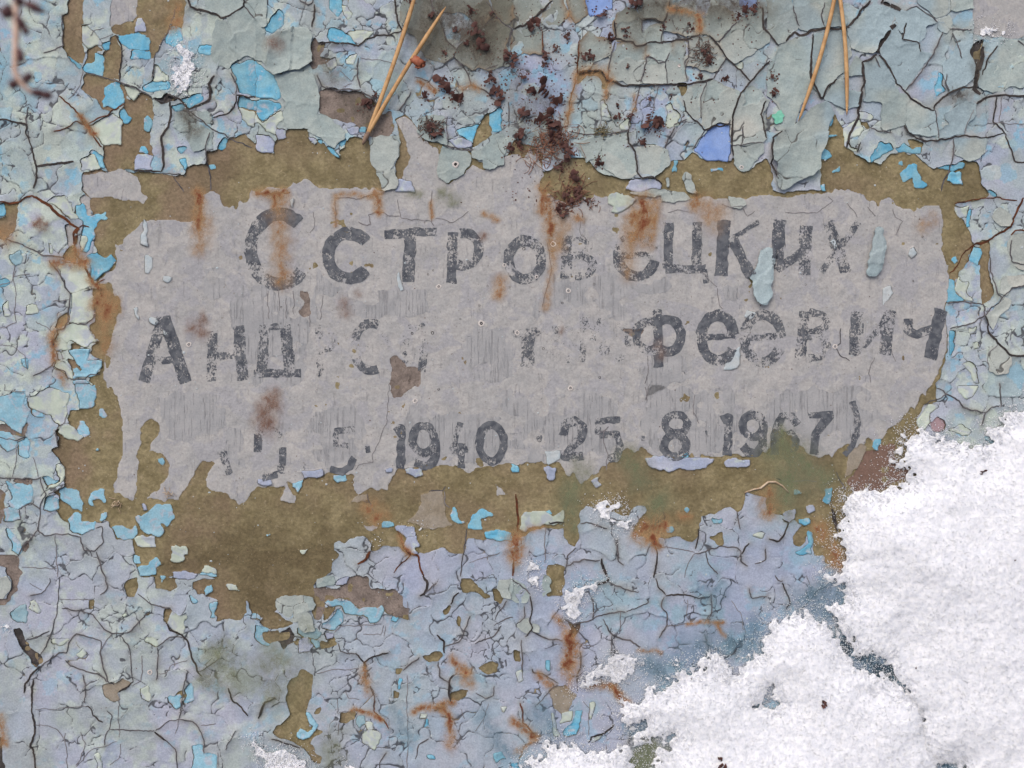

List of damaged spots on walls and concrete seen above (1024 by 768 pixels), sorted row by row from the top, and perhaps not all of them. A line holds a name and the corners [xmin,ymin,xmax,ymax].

crack [54,0,256,192]
corrosion [538,187,583,270]
corrosion [627,192,658,258]
crack [567,0,1024,424]
peeling [0,0,955,653]
crack [0,436,300,768]
peeling [423,651,443,662]
corrosion [552,616,578,683]
crack [316,512,826,768]
peeling [273,669,323,764]
peeling [339,711,381,750]
corrosion [412,700,456,749]